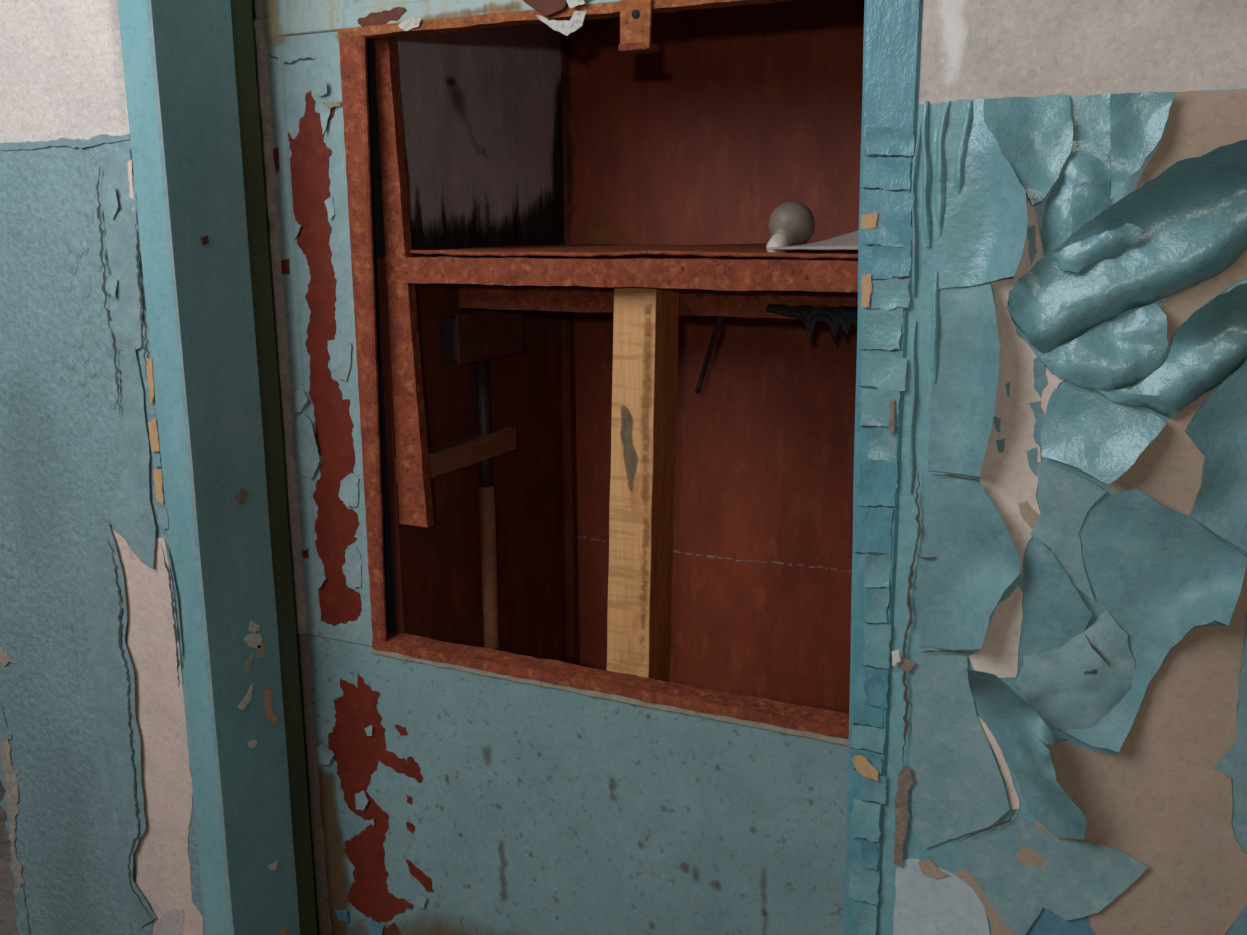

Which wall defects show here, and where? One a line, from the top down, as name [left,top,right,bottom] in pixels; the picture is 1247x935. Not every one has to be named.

corrosion [421,3,519,22]
peeling [0,133,204,935]
corrosion [318,773,348,935]
peeling [892,90,1247,935]